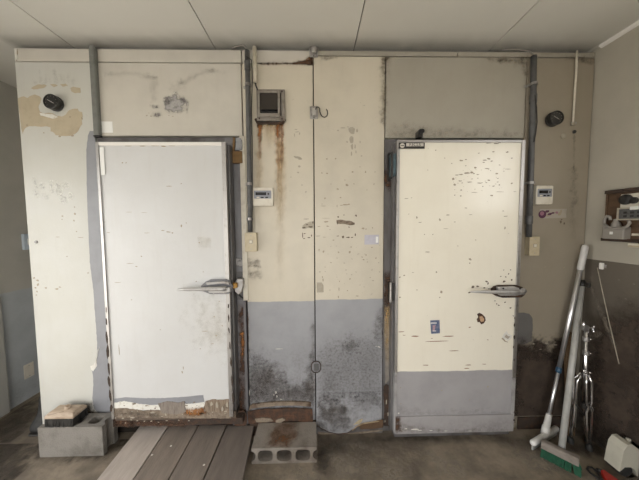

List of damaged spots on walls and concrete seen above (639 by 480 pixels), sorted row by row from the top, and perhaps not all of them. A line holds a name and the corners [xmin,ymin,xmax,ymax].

corrosion [261,57,312,65]
peeling [18,84,83,137]
mould [146,94,188,117]
corrosion [254,118,286,153]
corrosion [105,308,190,427]
corrosion [231,307,313,426]
damp [514,339,565,416]
damp [588,313,639,444]